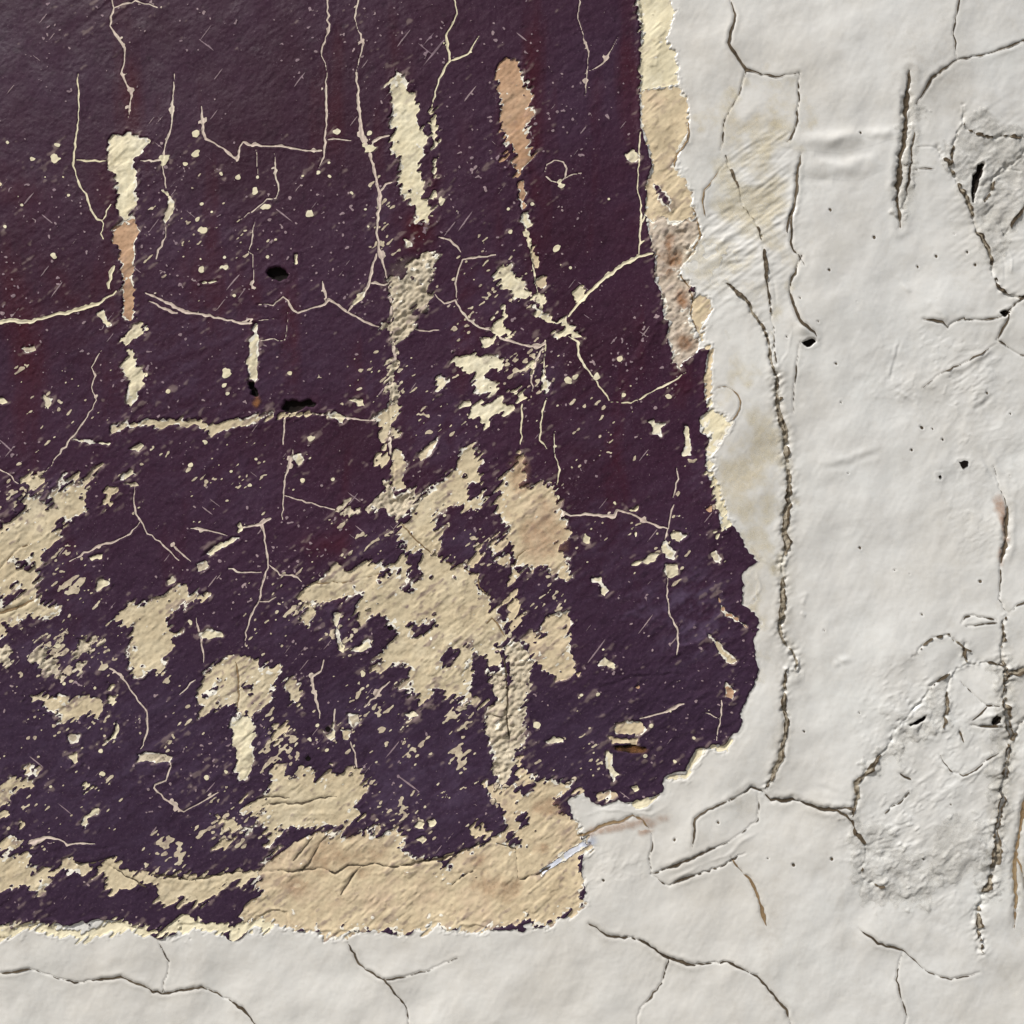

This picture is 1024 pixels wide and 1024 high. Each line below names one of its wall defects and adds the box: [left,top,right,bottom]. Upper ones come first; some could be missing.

crack [69,418,390,721]
crack [140,0,438,489]
peeling [0,132,647,945]
peeling [377,71,441,224]
peeling [494,57,537,229]
crack [435,131,682,483]
peeling [632,515,691,586]
peeling [625,0,733,563]
peeling [708,634,737,664]
crack [562,0,885,925]
crack [895,0,1024,388]
crack [921,466,1024,953]